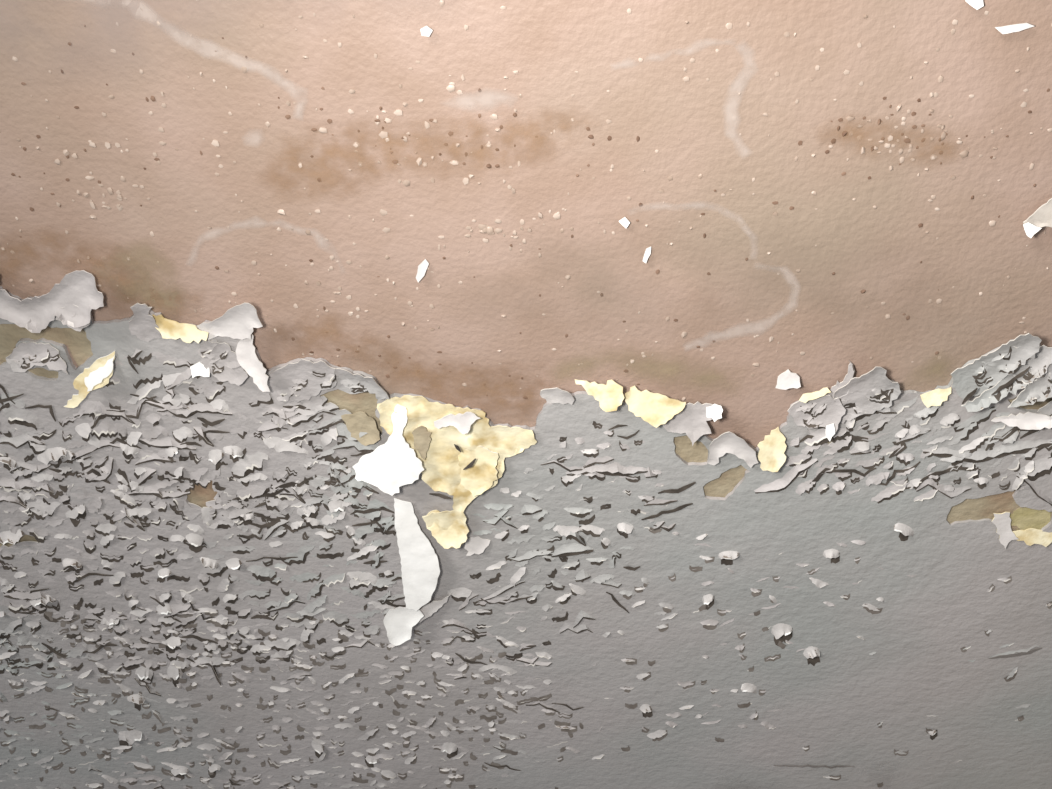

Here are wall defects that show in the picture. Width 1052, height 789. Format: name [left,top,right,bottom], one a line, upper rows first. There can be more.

flaking render [901,98,932,149]
peeling [416,259,429,282]